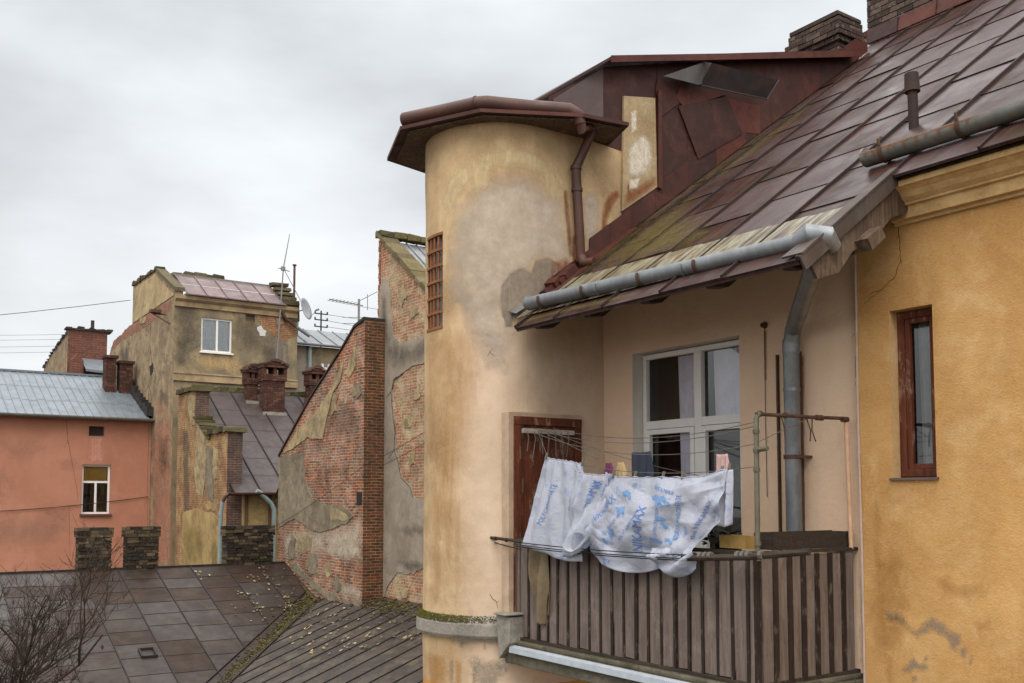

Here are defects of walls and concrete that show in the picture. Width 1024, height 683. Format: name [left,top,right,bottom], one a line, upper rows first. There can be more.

water stain [445,149,565,358]
corrosion [603,181,654,227]
spalling [256,315,297,340]
flaking render [181,394,223,565]
flaking render [278,346,362,607]
spalling [393,363,425,499]
spalling [385,568,423,604]